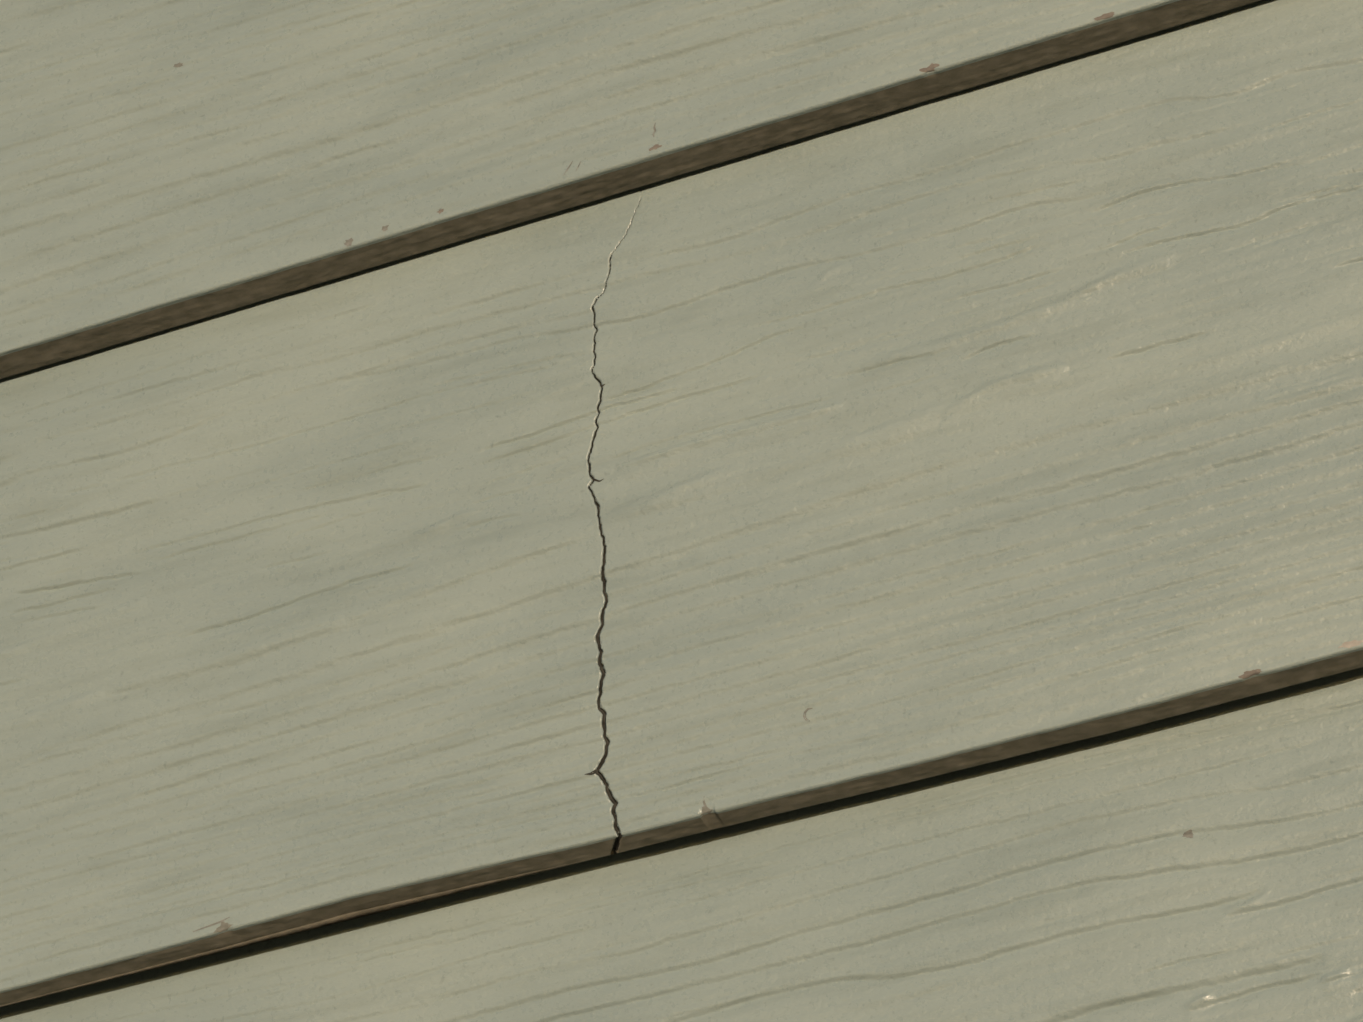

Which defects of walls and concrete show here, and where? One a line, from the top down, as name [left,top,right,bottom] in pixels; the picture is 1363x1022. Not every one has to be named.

crack [585,199,641,851]